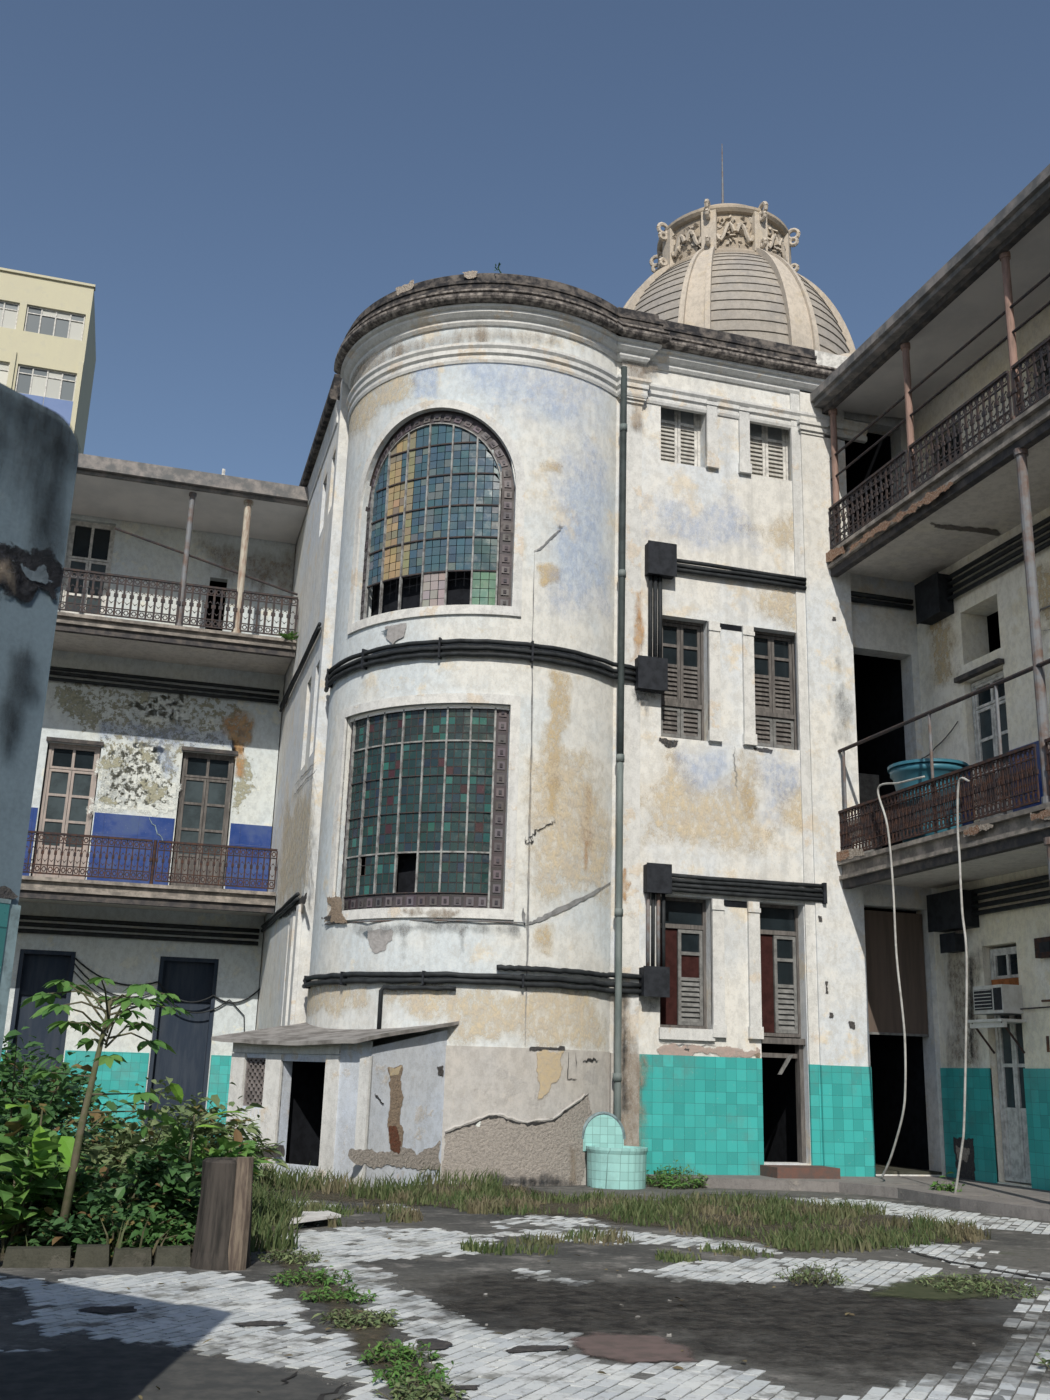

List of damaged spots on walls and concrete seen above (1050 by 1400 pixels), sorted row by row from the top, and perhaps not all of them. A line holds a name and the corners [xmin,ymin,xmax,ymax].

damp [0,499,64,602]
peeling [50,682,257,816]
damp [529,672,609,898]
peeling [387,1065,404,1154]
spalling [442,1093,592,1186]
peeling [529,1046,565,1099]